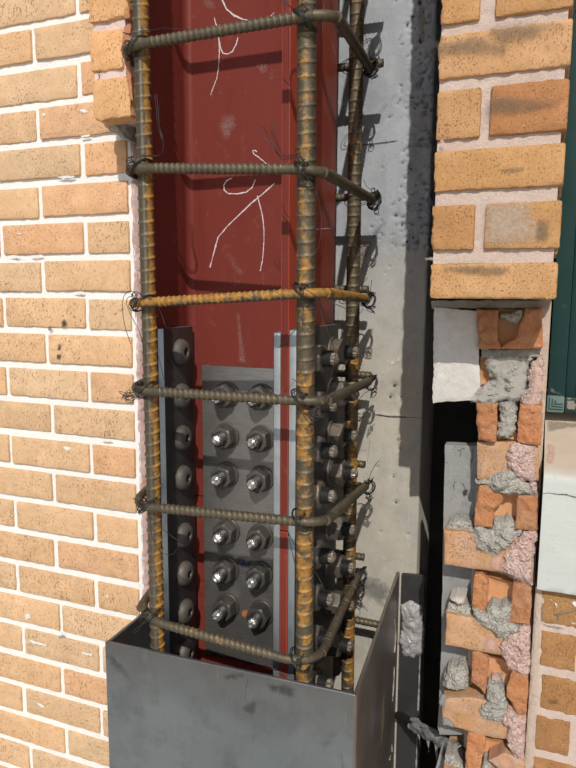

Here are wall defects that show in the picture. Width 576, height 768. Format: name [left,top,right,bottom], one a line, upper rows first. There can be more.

spalling [476,307,543,350]
spalling [476,401,499,442]
spalling [517,401,543,445]
spalling [474,484,504,528]
spalling [515,488,538,531]